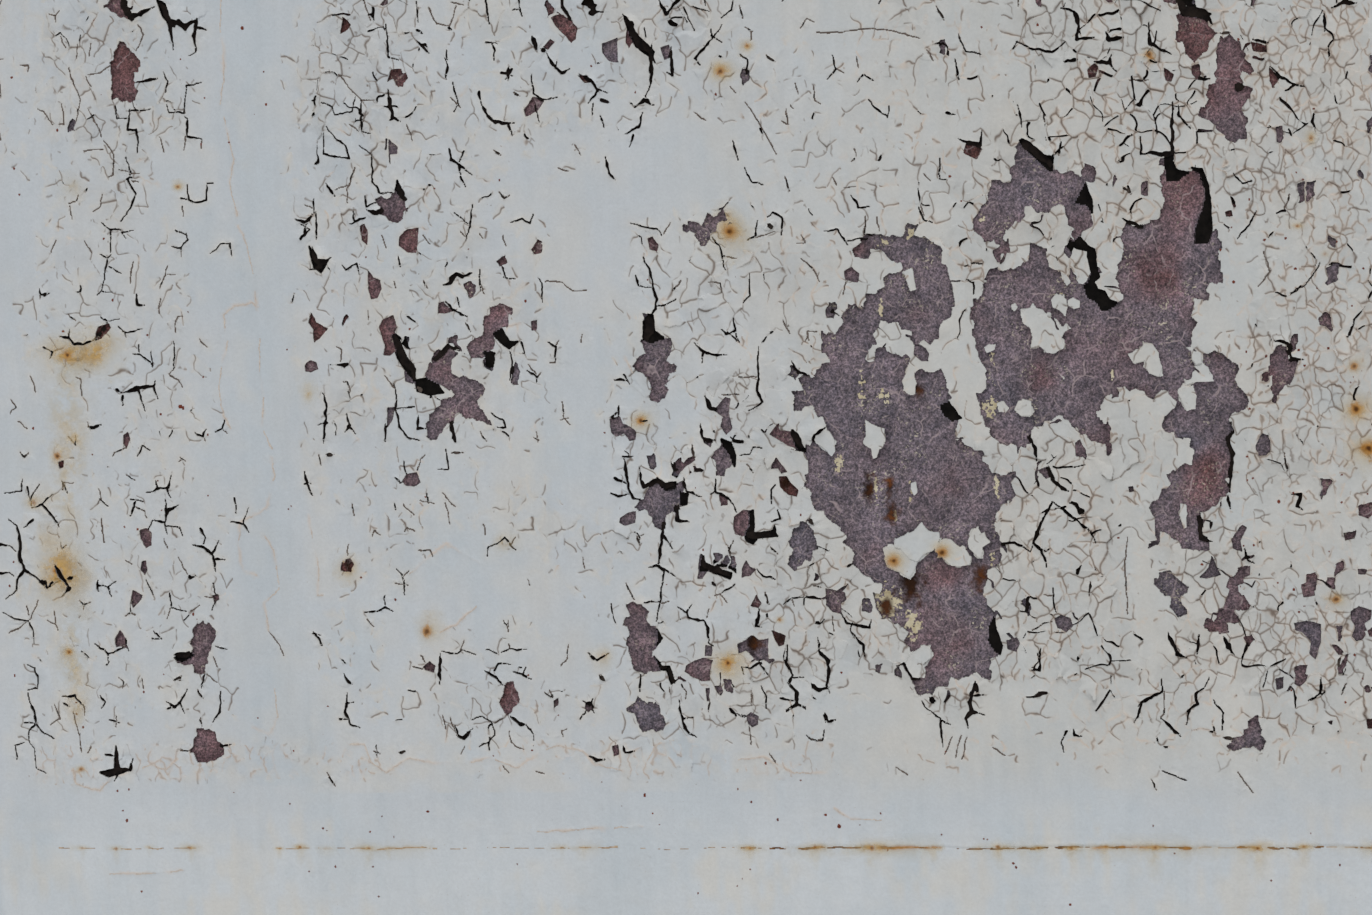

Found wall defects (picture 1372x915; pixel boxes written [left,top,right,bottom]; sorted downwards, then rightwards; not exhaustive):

crack [1323,0,1357,32]
peeling [37,0,194,220]
peeling [296,0,537,445]
crack [1233,173,1320,291]
crack [0,0,249,782]
crack [295,0,1305,793]
peeling [516,0,1372,766]
peeling [173,576,221,688]
corrosion [747,635,762,650]
corrosion [879,555,927,615]
corrosion [704,834,942,851]
corrosion [957,833,1324,869]